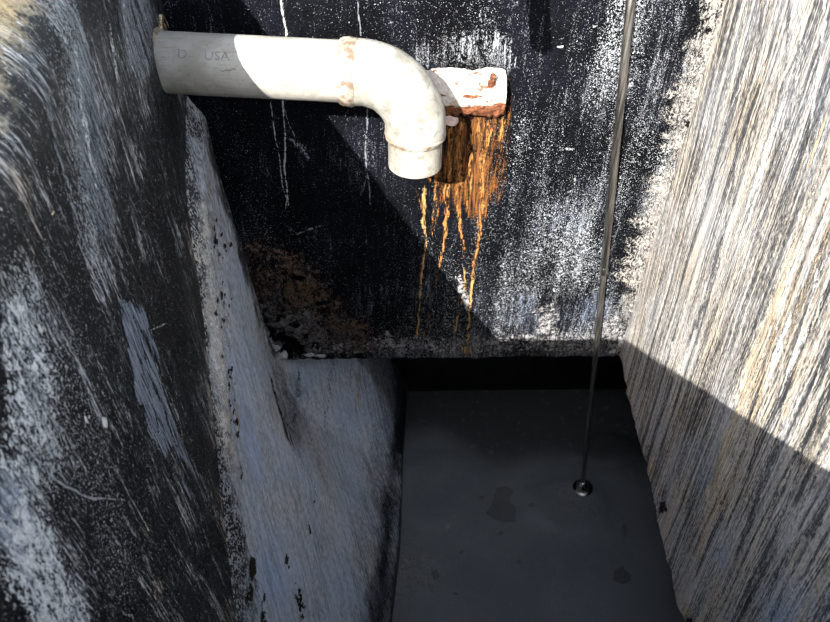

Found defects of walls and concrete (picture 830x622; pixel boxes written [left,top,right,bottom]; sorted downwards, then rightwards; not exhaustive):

water stain [240,218,602,355]
corrosion [416,100,510,355]